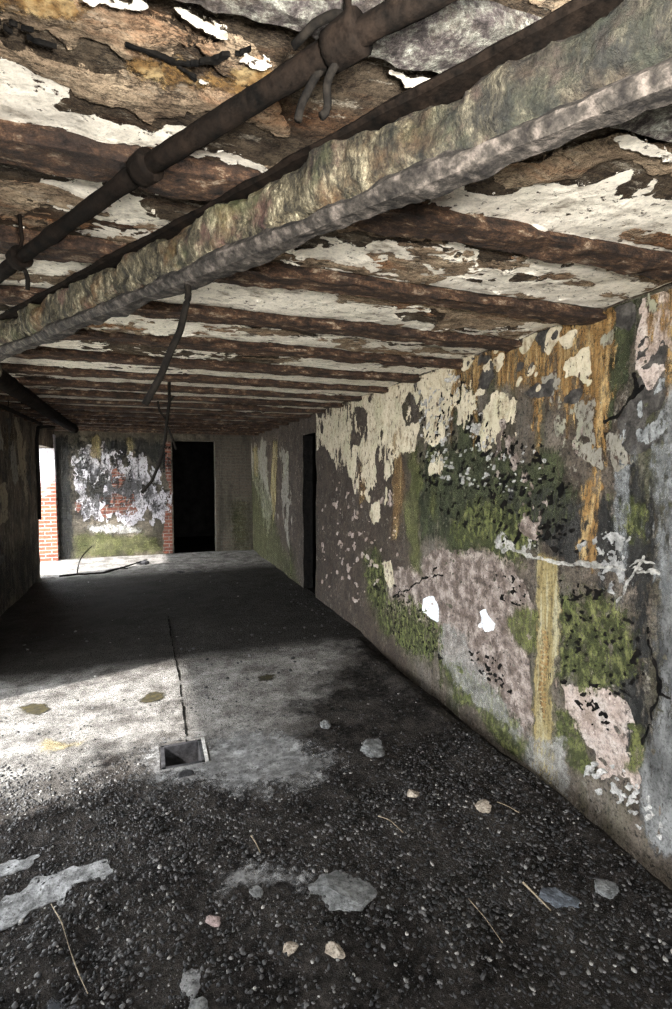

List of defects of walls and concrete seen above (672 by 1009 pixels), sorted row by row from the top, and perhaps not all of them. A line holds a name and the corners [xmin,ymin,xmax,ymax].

rust [0,0,92,25]
peeling [83,0,148,11]
peeling [174,4,228,40]
rust [127,53,273,94]
peeling [0,57,186,147]
peeling [614,130,672,163]
flaking render [0,175,103,228]
peeling [76,193,170,243]
peeling [428,169,672,252]
peeling [0,226,672,745]
mould [366,563,443,660]
leakage [415,374,672,857]